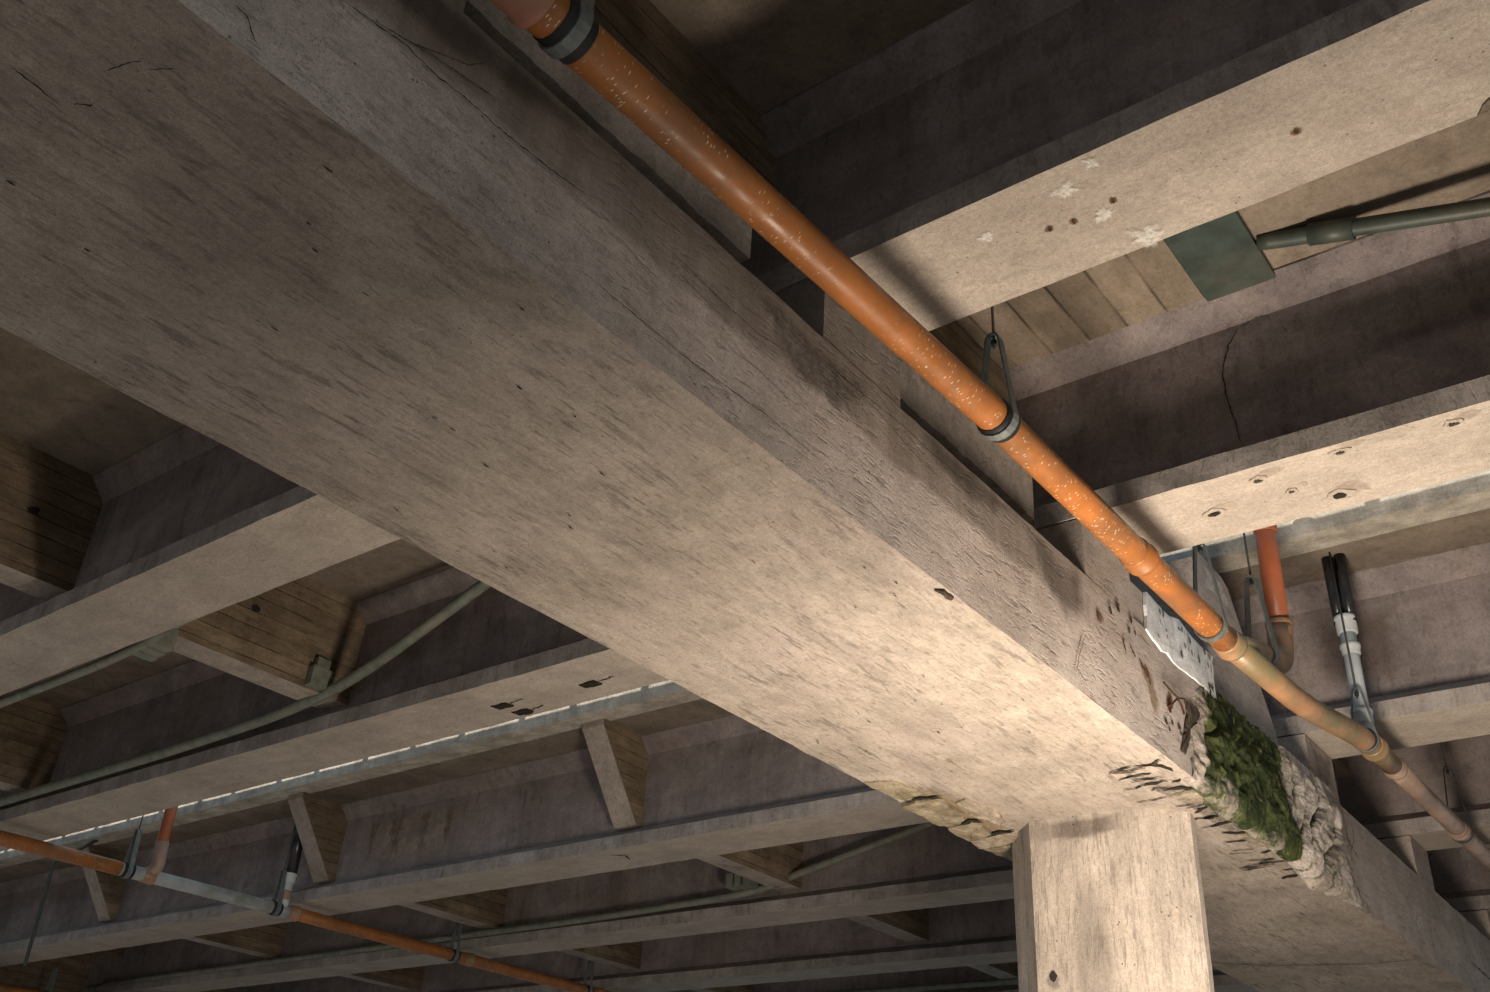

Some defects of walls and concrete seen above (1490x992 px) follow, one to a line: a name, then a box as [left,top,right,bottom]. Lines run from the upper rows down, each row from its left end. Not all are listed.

crack [1222,315,1267,441]
spalling [1163,681,1200,755]
peeling [864,780,1018,860]
spalling [1109,745,1364,909]